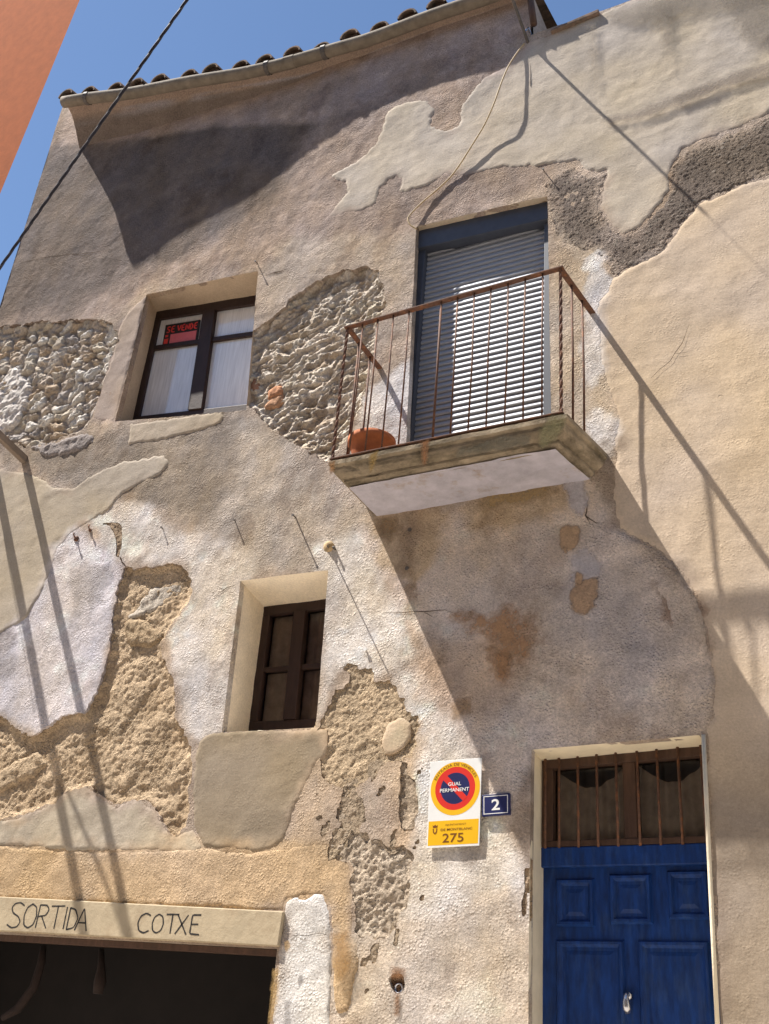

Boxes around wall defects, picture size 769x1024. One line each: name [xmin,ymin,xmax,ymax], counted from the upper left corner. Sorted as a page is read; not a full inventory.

spalling [544,116,769,275]
spalling [560,525,580,553]
spalling [570,572,598,615]
spalling [0,564,193,836]
spalling [314,663,424,966]